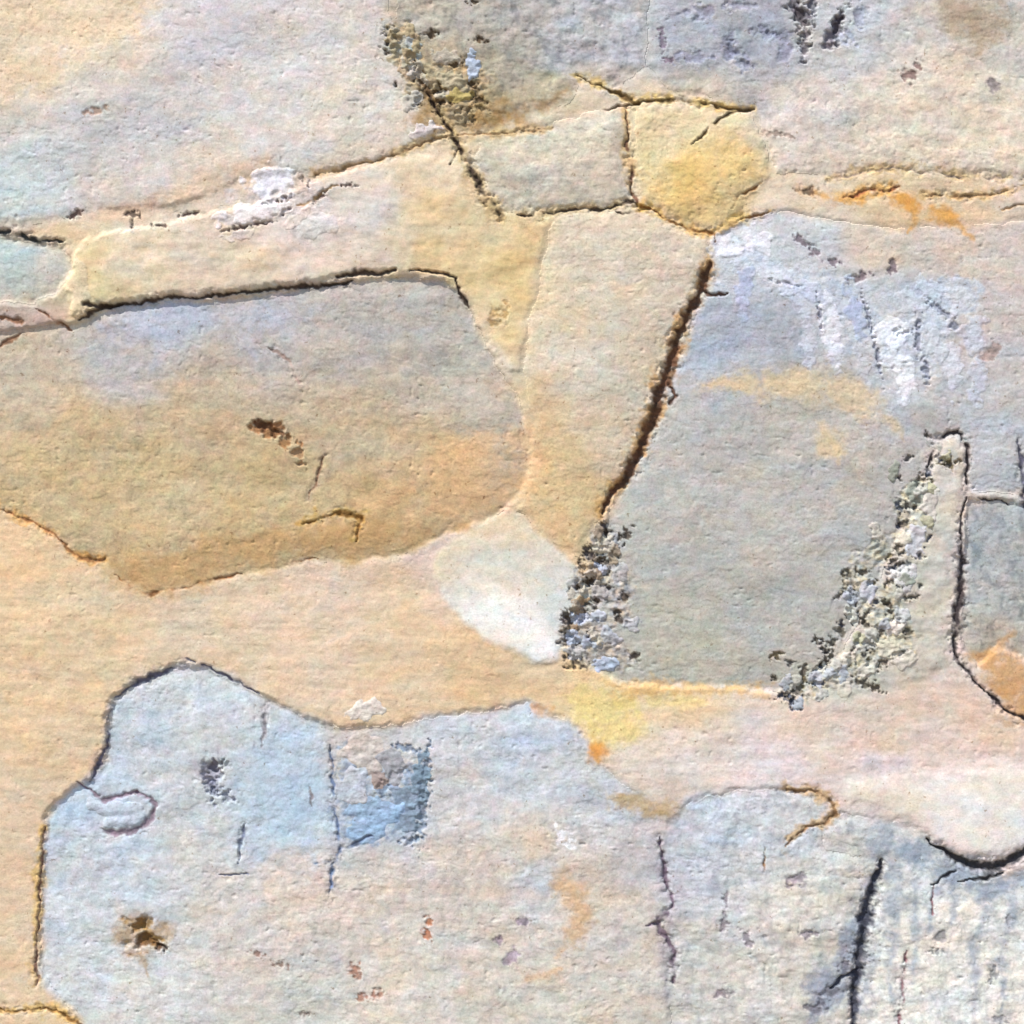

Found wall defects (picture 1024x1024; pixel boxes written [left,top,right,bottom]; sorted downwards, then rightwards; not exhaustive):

spalling [375,17,501,137]
crack [0,266,470,350]
crack [296,66,777,522]
spalling [554,517,645,676]
spalling [768,449,959,712]
crack [915,421,1024,732]
crack [829,855,917,1024]
crack [921,828,1024,917]